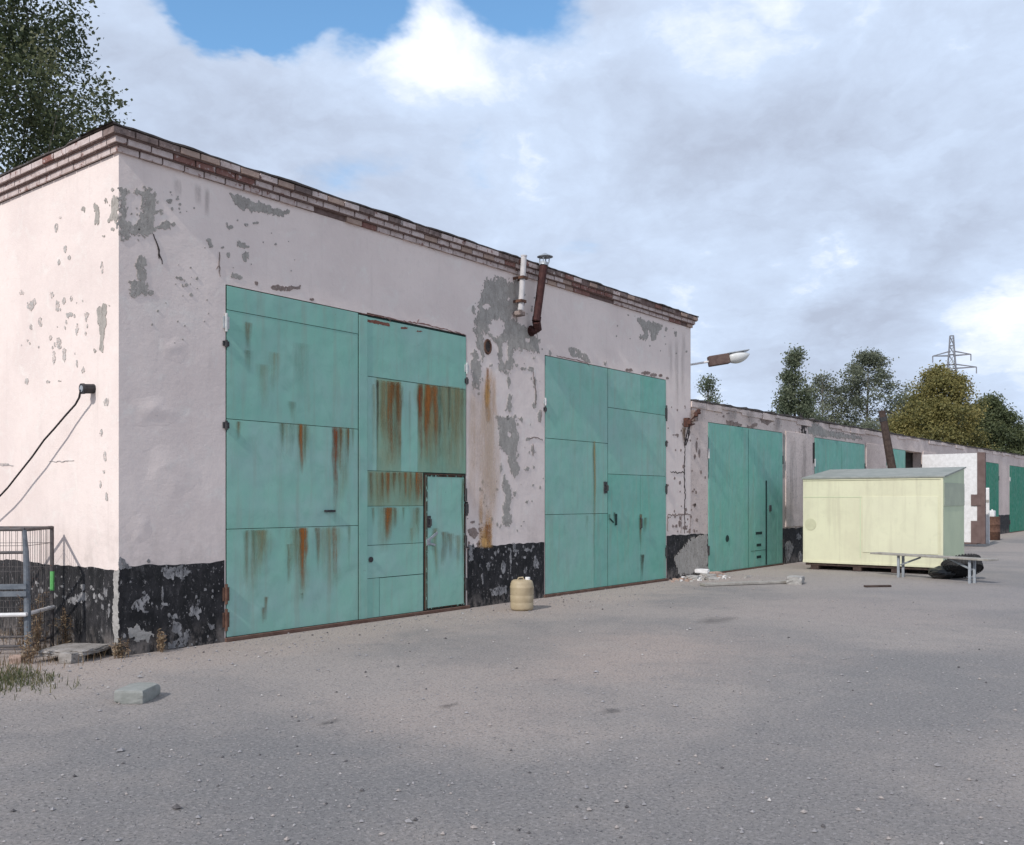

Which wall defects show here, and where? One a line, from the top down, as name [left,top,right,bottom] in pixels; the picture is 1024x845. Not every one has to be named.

peeling [81,186,195,242]
peeling [226,193,290,230]
peeling [128,255,154,298]
peeling [19,291,110,373]
peeling [627,314,677,352]
rust [333,427,349,474]
rust [377,381,399,423]
rust [418,385,460,439]
peeling [467,275,551,596]
peeling [667,423,709,576]
rust [300,528,330,574]
peeling [31,557,220,649]